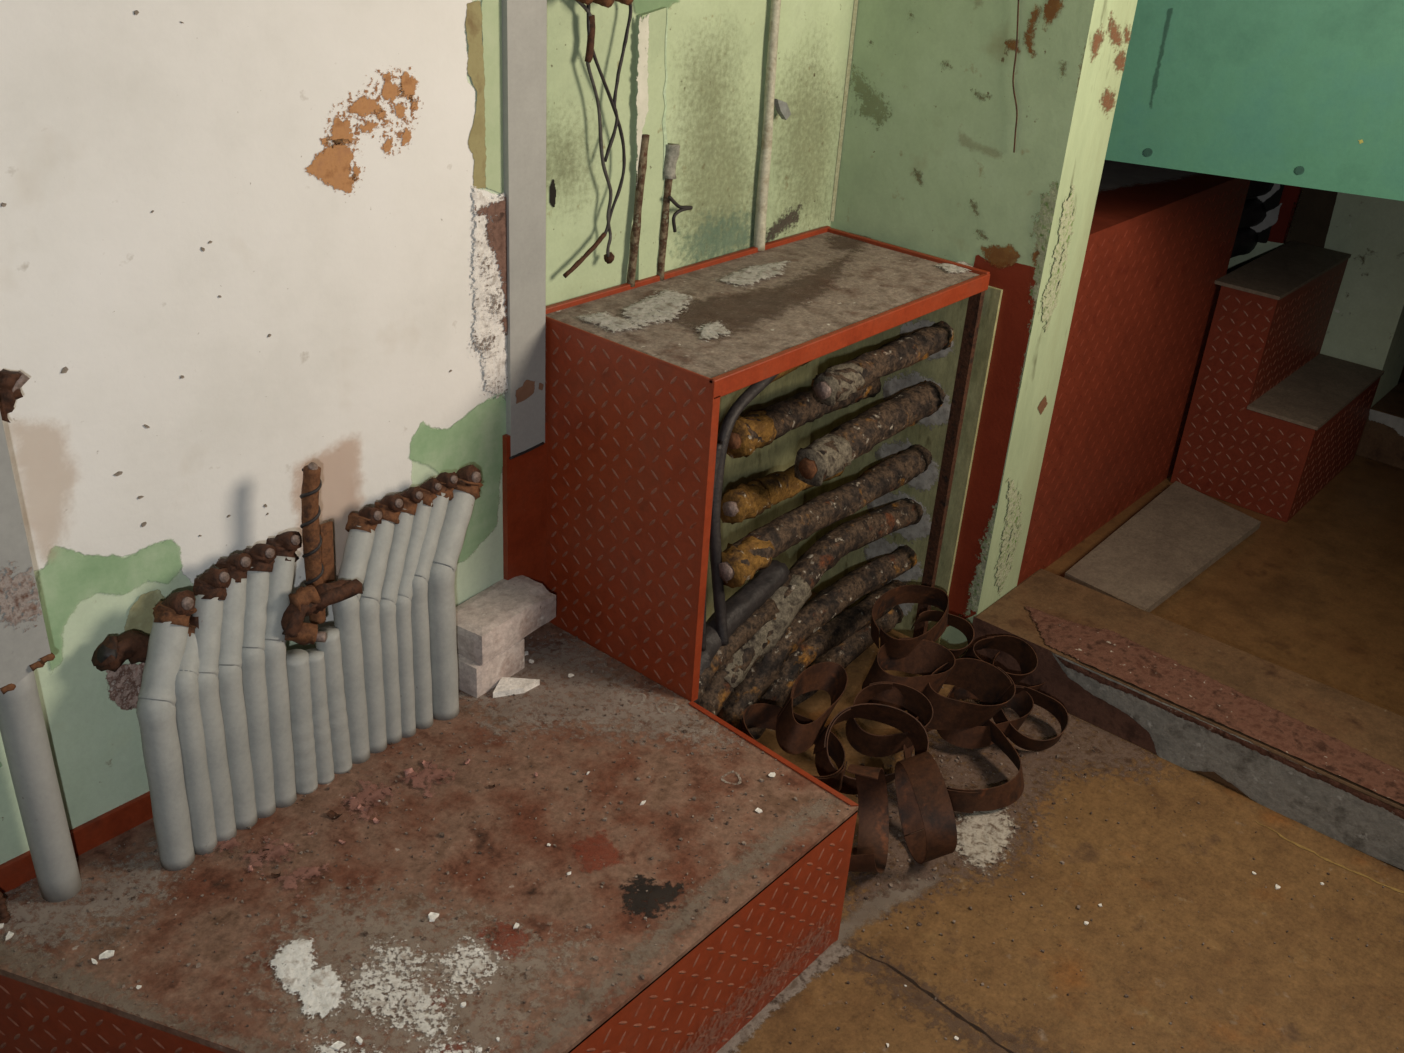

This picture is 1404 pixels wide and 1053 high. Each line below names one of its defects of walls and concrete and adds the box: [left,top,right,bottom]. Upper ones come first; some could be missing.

peeling [305,67,422,197]
corrosion [1004,0,1064,58]
corrosion [1076,12,1132,93]
corrosion [1100,89,1116,115]
peeling [410,0,508,563]
flaking render [1027,182,1076,335]
peeling [38,540,182,670]
peeling [959,478,1404,870]
crack [842,945,1014,1053]